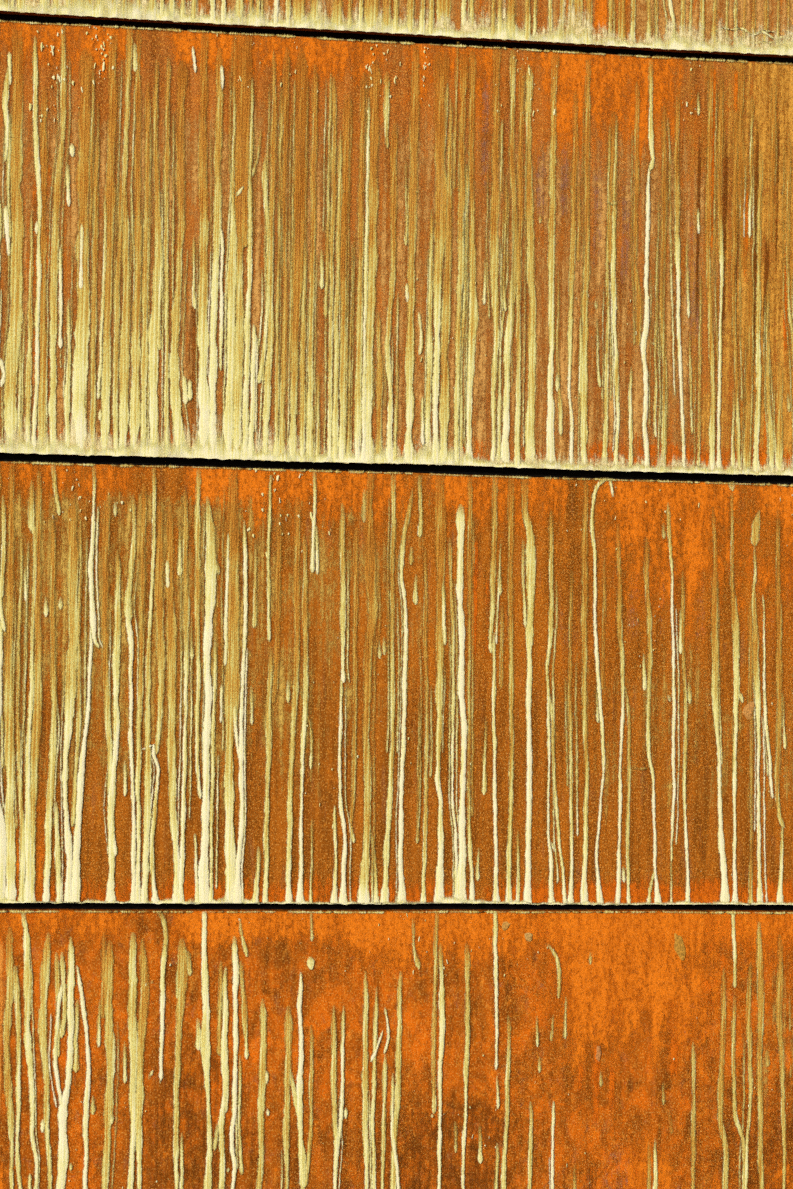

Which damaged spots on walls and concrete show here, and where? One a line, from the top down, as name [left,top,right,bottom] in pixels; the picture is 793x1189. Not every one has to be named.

rust [0,22,143,78]
rust [168,31,384,89]
rust [519,51,693,176]
damp [0,31,793,472]
rust [695,69,786,363]
rust [0,463,141,508]
rust [184,467,412,531]
rust [431,475,569,655]
rust [585,390,793,636]
damp [0,468,793,1189]
rust [0,802,793,1121]
rust [623,1133,674,1189]